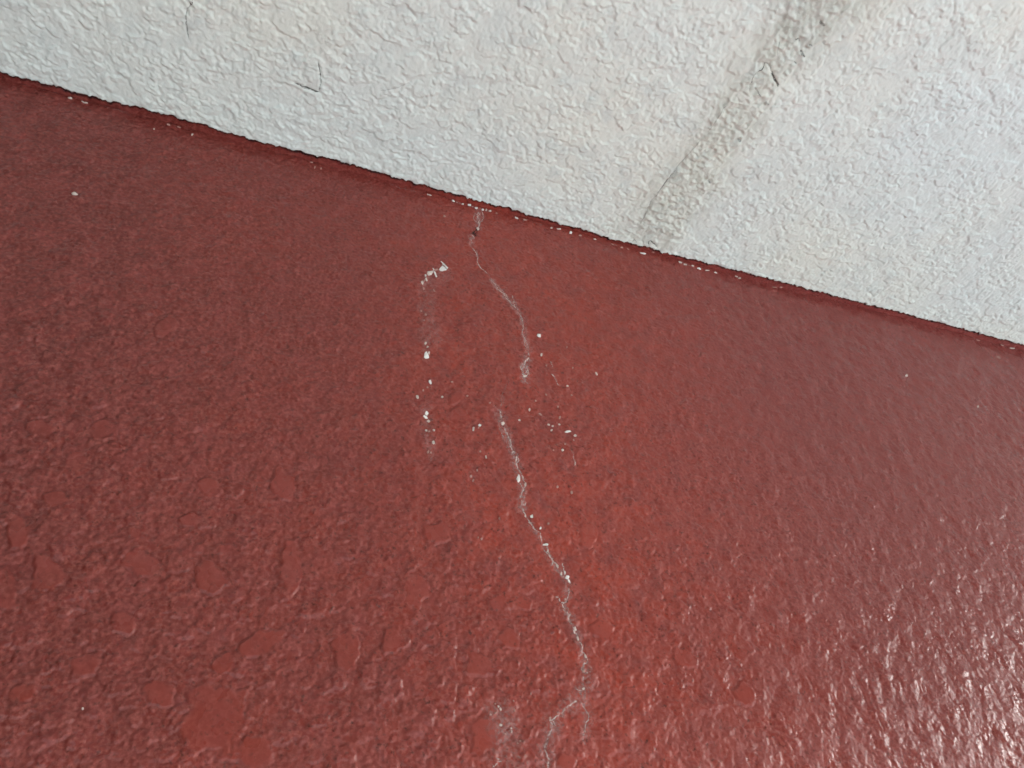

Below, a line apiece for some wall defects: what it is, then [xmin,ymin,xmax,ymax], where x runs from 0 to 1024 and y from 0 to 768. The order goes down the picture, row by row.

crack [471,212,529,379]
crack [500,412,589,763]